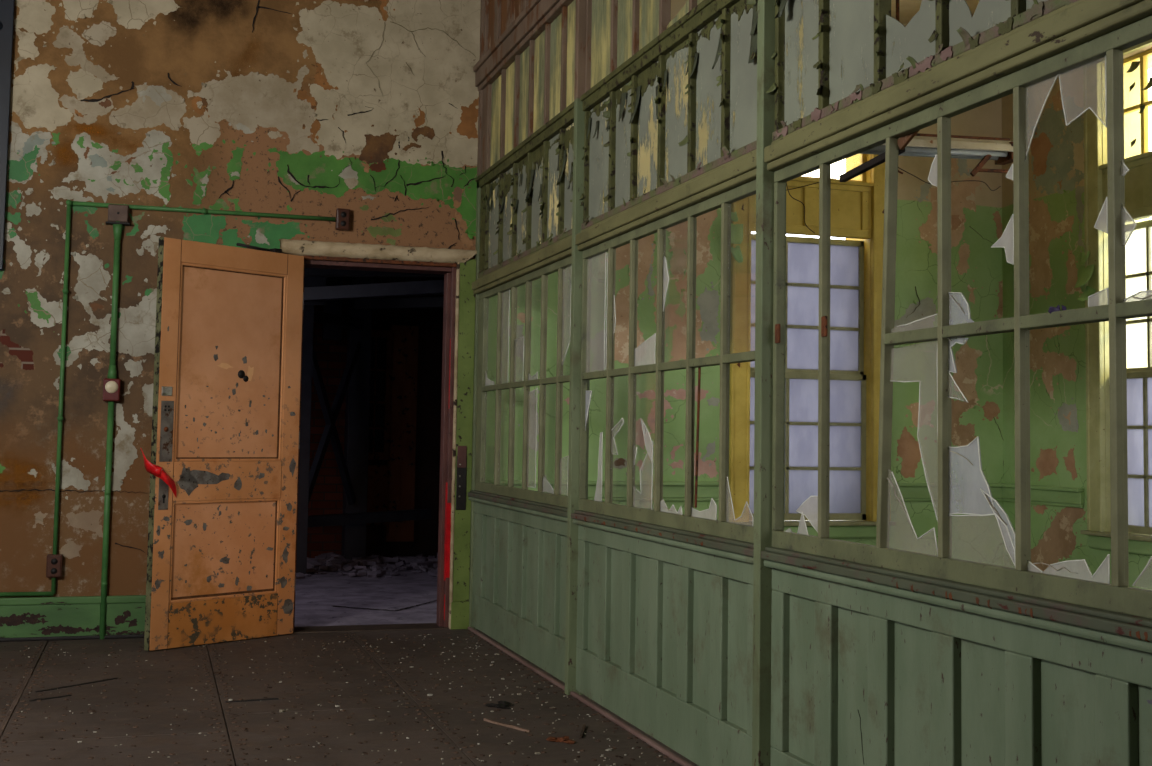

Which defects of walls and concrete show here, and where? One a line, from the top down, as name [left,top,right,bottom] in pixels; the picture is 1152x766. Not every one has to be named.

crack [80,81,134,102]
crack [252,0,291,33]
crack [278,21,476,220]
peeling [0,0,758,565]